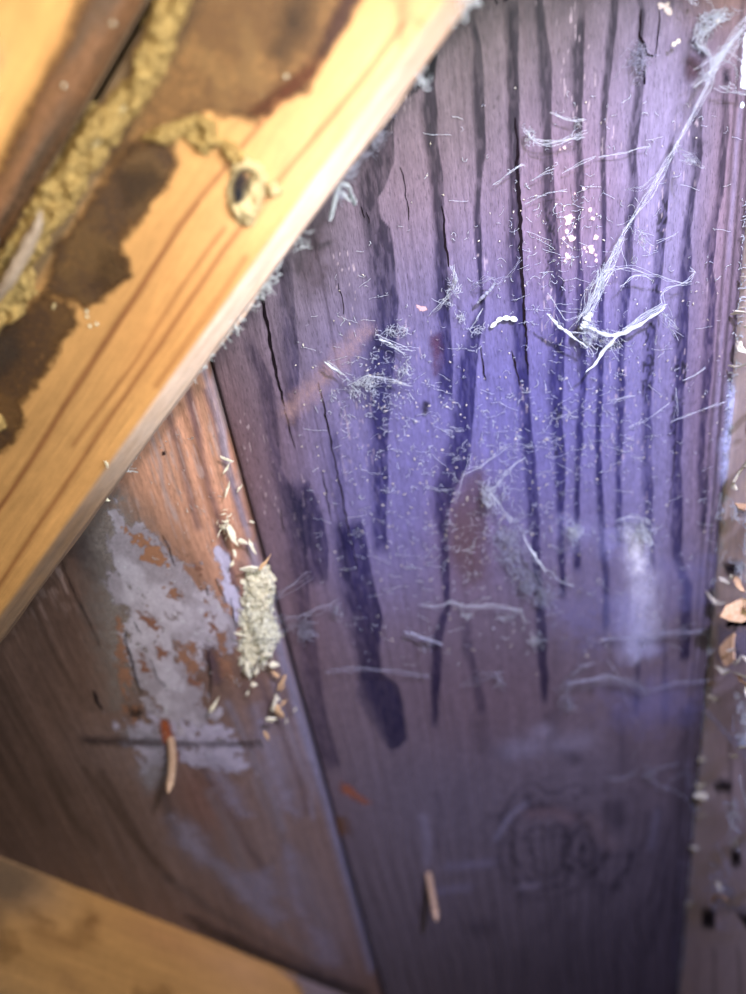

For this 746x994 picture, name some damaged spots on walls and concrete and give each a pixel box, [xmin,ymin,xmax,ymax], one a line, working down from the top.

leakage [0,0,358,450]
crack [259,294,295,446]
peeling [120,526,203,601]
peeling [112,599,240,733]